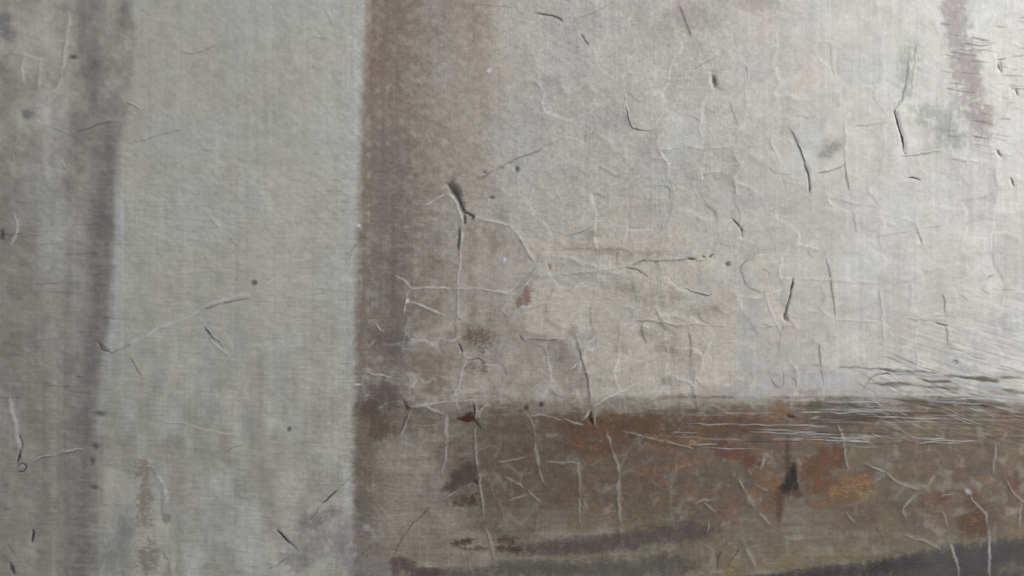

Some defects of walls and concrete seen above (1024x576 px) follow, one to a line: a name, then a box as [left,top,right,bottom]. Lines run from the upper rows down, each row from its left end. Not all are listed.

crack [895,115,932,180]
crack [765,281,794,330]
crack [401,184,643,556]
crack [9,399,81,472]
corrosion [459,412,477,422]
crack [531,383,691,520]
corrosion [601,414,761,466]
crack [839,428,991,573]
crack [993,449,1024,525]
water stain [498,527,695,576]
water stain [779,541,1024,576]